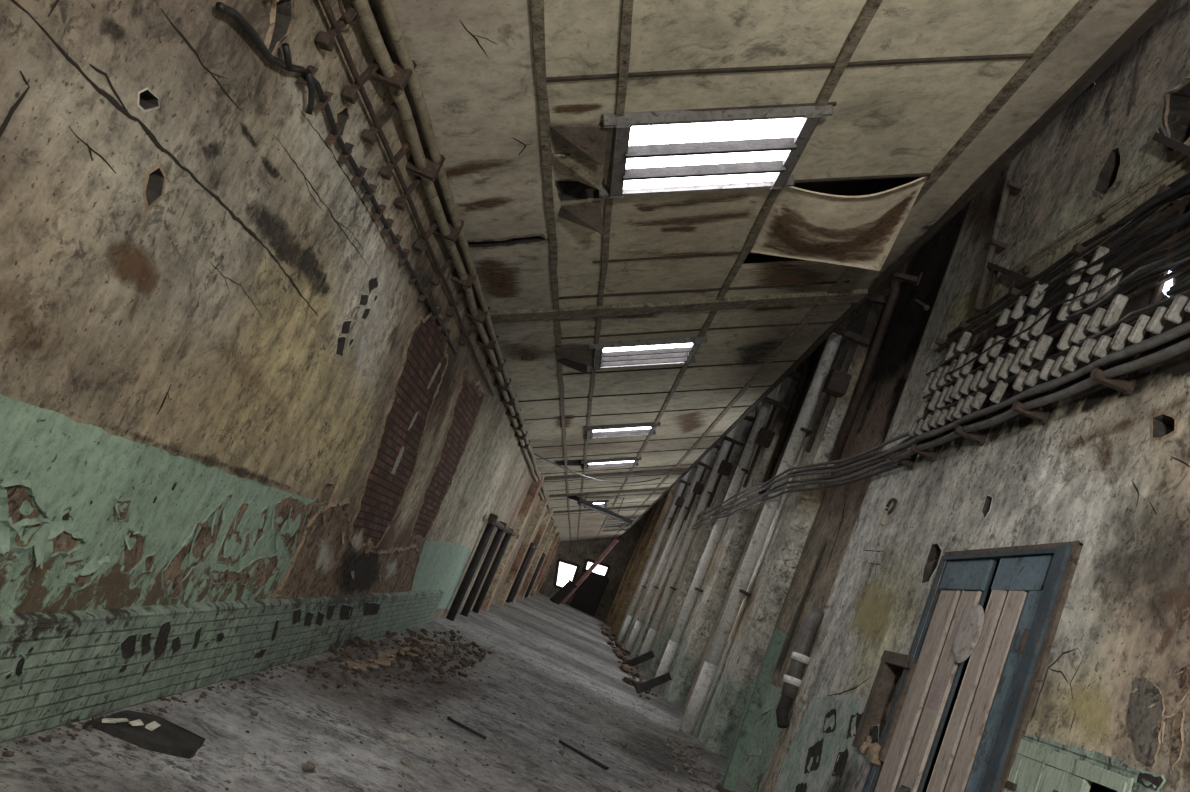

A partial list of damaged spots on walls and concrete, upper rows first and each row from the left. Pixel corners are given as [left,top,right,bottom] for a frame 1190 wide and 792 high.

crack [0,70,30,137]
crack [11,0,318,320]
crack [274,104,387,265]
water stain [634,196,748,232]
spalling [1162,76,1190,162]
peeling [0,479,87,569]
flaking render [67,306,485,659]
peeling [4,643,36,681]
peeling [118,619,224,680]